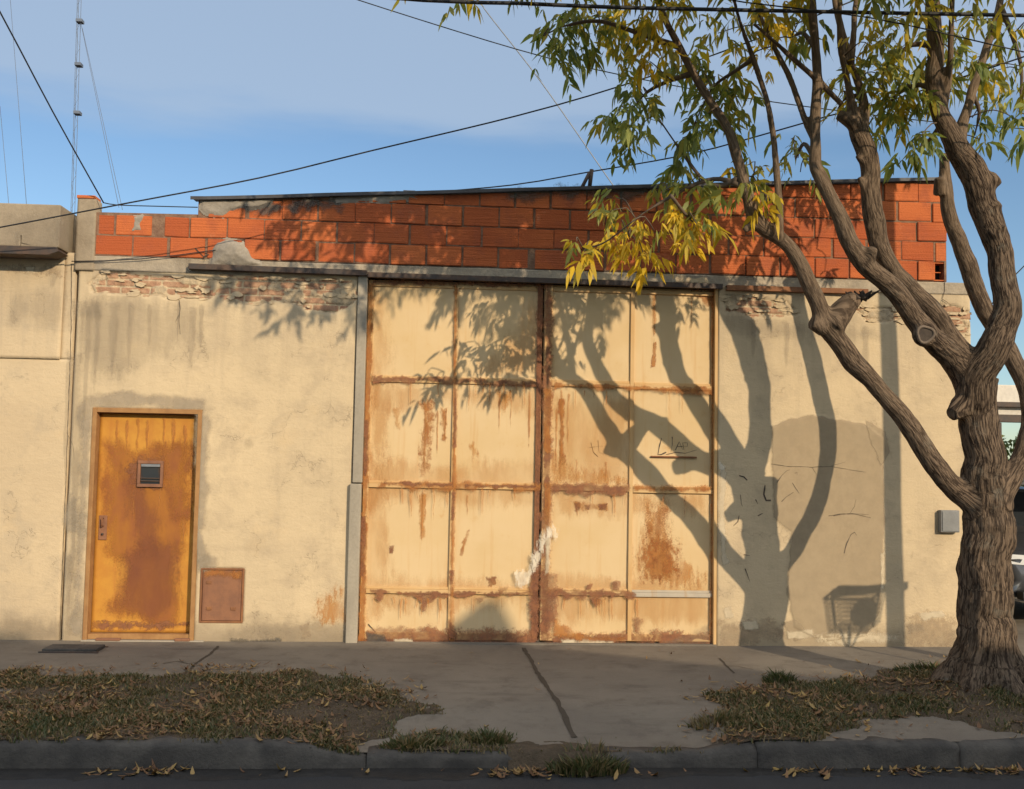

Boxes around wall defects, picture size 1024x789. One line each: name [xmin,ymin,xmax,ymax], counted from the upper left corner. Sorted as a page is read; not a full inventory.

spalling [87,270,358,314]
spalling [719,294,800,320]
spalling [857,303,905,325]
spalling [942,304,972,337]
corrosion [358,279,714,644]
corrosion [98,418,193,631]